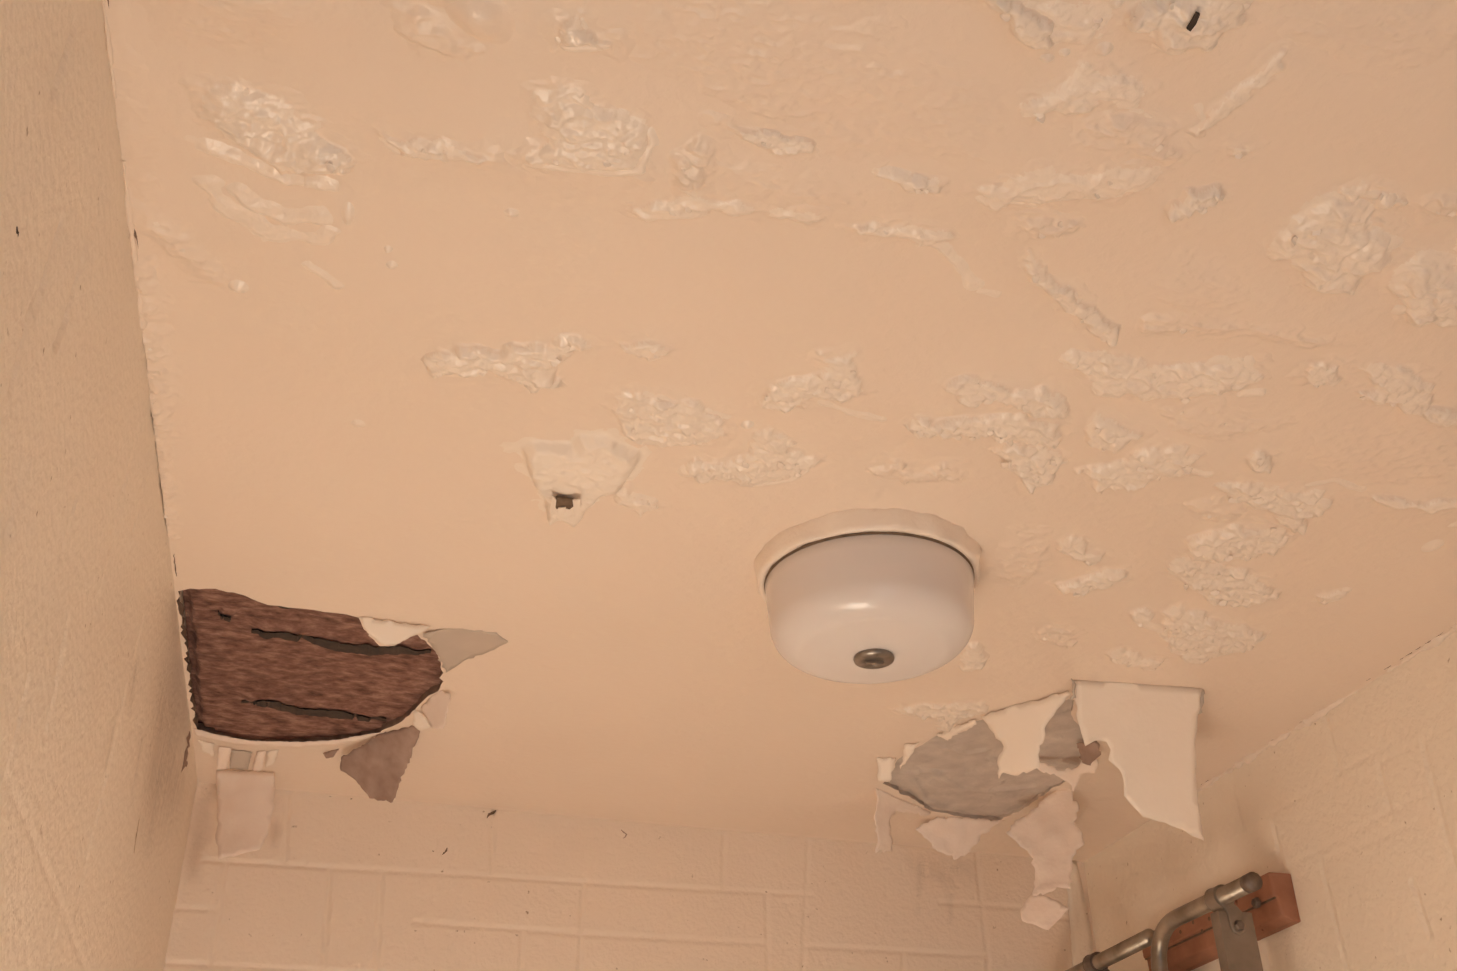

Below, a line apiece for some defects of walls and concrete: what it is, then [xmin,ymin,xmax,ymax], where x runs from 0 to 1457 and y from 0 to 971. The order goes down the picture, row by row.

peeling [499,428,658,528]
peeling [198,739,279,771]
flaking render [874,679,1205,930]